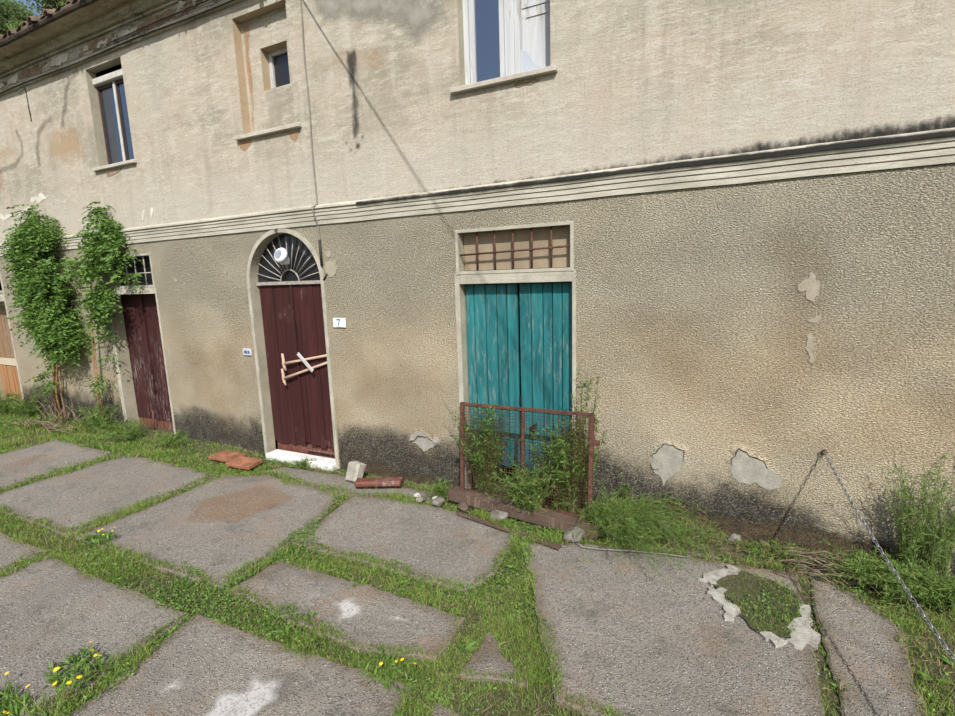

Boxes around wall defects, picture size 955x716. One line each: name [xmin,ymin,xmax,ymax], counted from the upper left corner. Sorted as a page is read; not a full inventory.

flaking render [7,0,203,85]
crack [0,20,144,121]
damp [346,51,359,148]
damp [675,119,955,161]
peeling [798,272,821,302]
peeling [805,315,820,364]
damp [174,407,265,455]
damp [337,427,460,487]
flaking render [408,428,443,454]
flaking render [646,438,691,487]
flaking render [724,442,789,493]
damp [577,454,889,552]